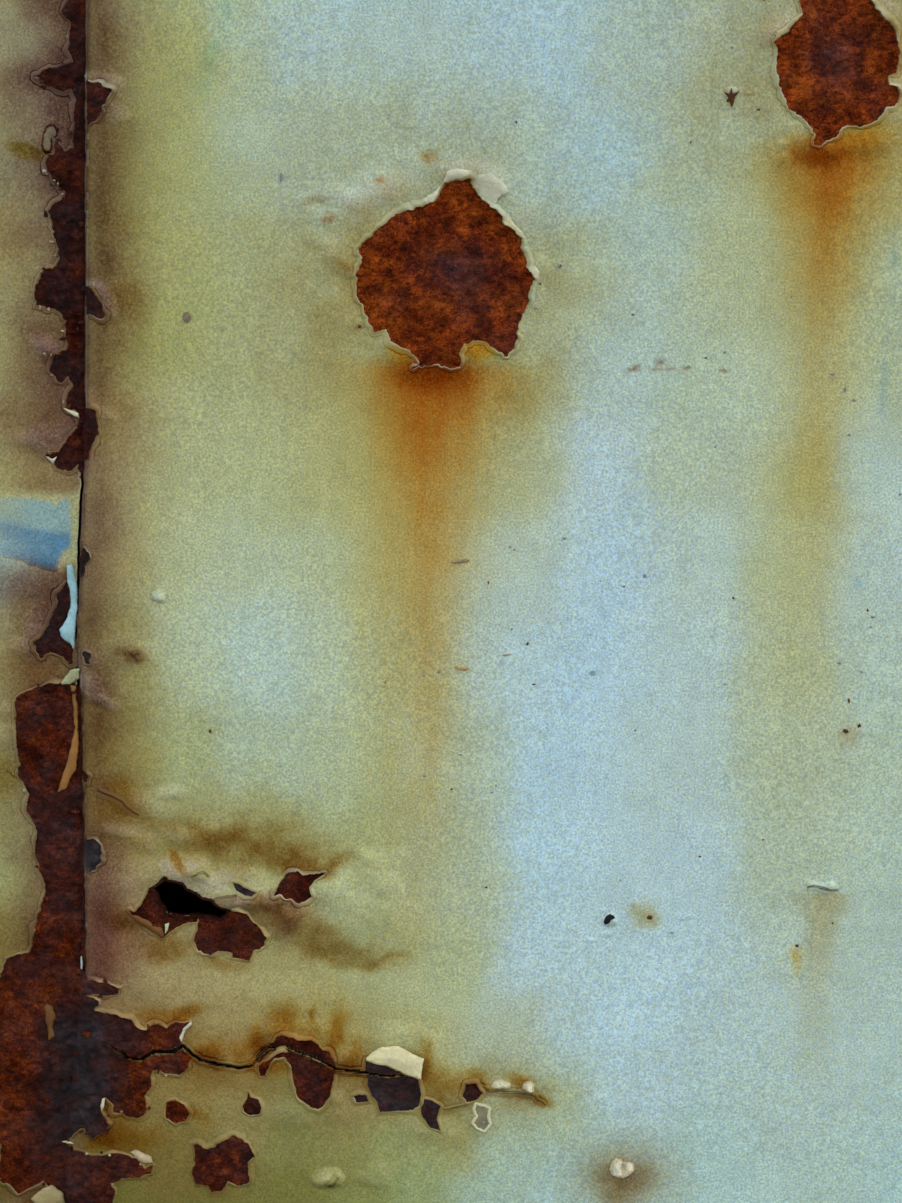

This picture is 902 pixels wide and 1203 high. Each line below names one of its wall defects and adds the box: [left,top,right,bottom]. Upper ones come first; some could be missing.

peeling [769,0,902,150]
peeling [350,168,540,374]
peeling [0,495,257,1203]
peeling [125,866,329,963]
crack [103,1040,548,1115]
peeling [240,1030,493,1134]